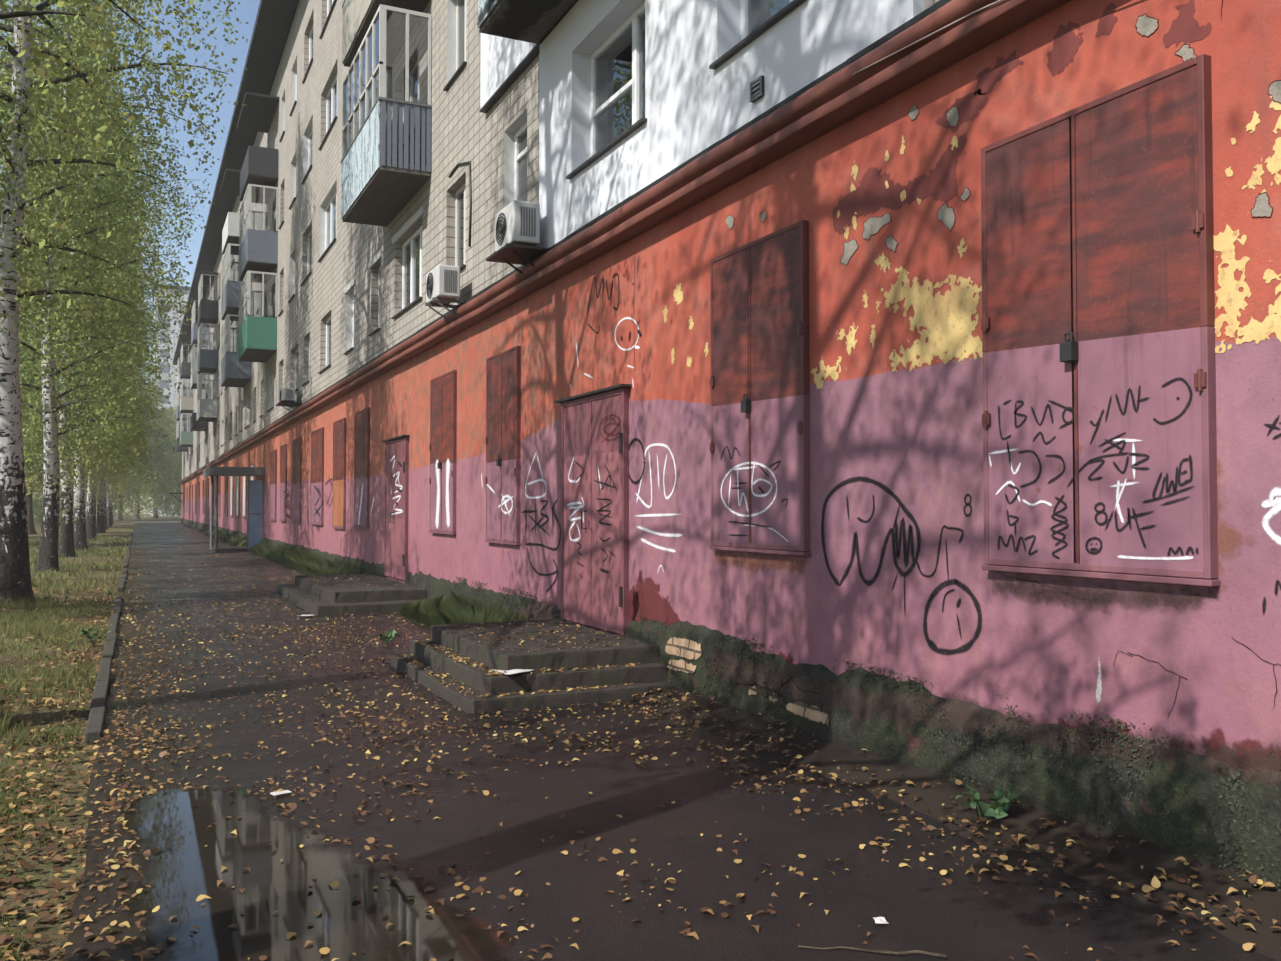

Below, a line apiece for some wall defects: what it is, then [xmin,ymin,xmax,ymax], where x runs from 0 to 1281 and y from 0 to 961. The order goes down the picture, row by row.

peeling [1047,2,1118,76]
peeling [1135,0,1211,62]
peeling [1225,80,1281,218]
peeling [811,50,1023,389]
peeling [1214,225,1281,353]
water stain [709,650,1281,785]
crack [1113,651,1187,725]